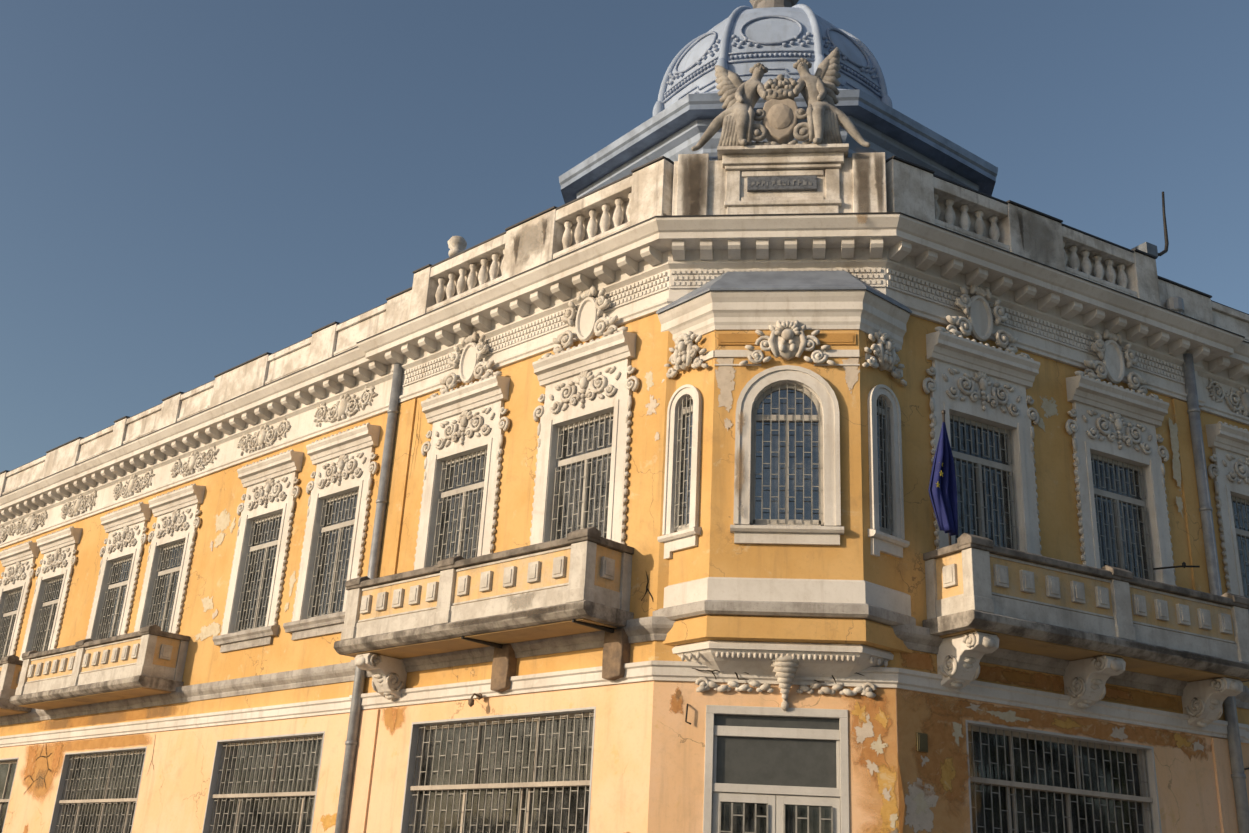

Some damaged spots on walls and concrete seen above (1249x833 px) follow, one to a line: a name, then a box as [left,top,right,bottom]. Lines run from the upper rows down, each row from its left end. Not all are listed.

crack [641,572,653,601]
peeling [850,693,938,833]